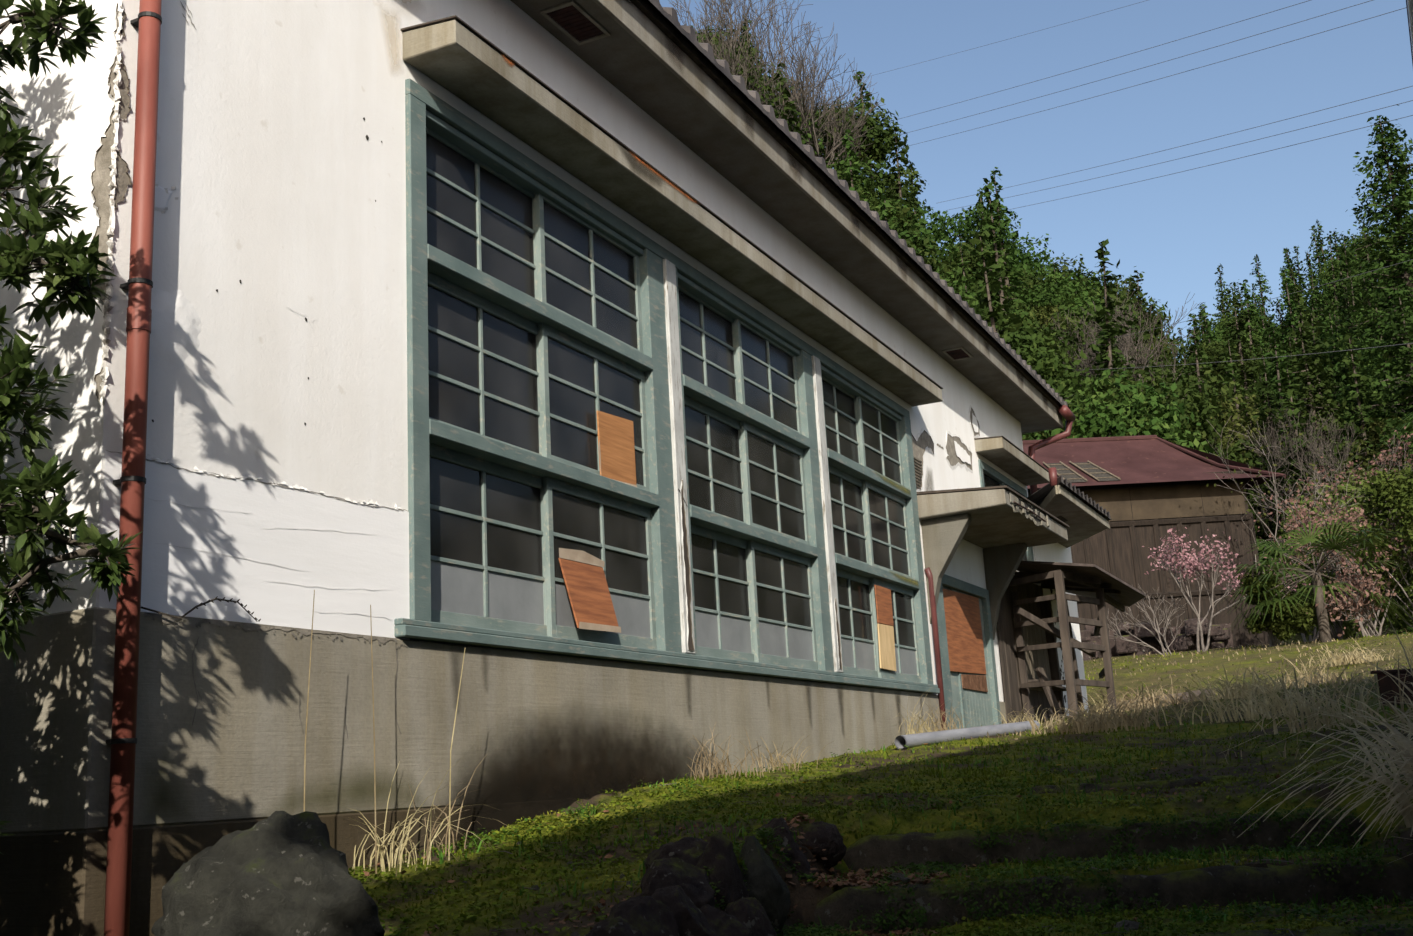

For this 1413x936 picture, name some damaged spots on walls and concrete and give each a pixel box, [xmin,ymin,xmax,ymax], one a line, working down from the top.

spalling [89,1,132,406]
spalling [911,405,980,492]
crack [106,450,407,733]